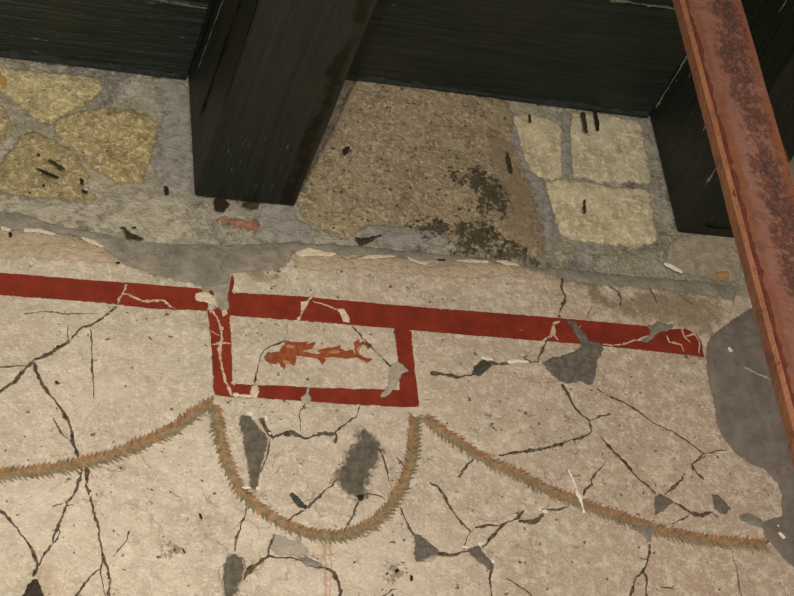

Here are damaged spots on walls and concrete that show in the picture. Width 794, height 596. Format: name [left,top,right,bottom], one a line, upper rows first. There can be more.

corrosion [762,95,794,206]
flaking render [0,226,120,264]
water stain [405,165,541,267]
crack [212,309,232,396]
crack [254,294,391,383]
crack [430,278,566,379]
crack [0,284,176,596]
crack [259,404,360,472]
crack [429,384,726,557]
flaking render [22,579,44,596]
crack [234,479,343,596]
crack [629,544,675,596]